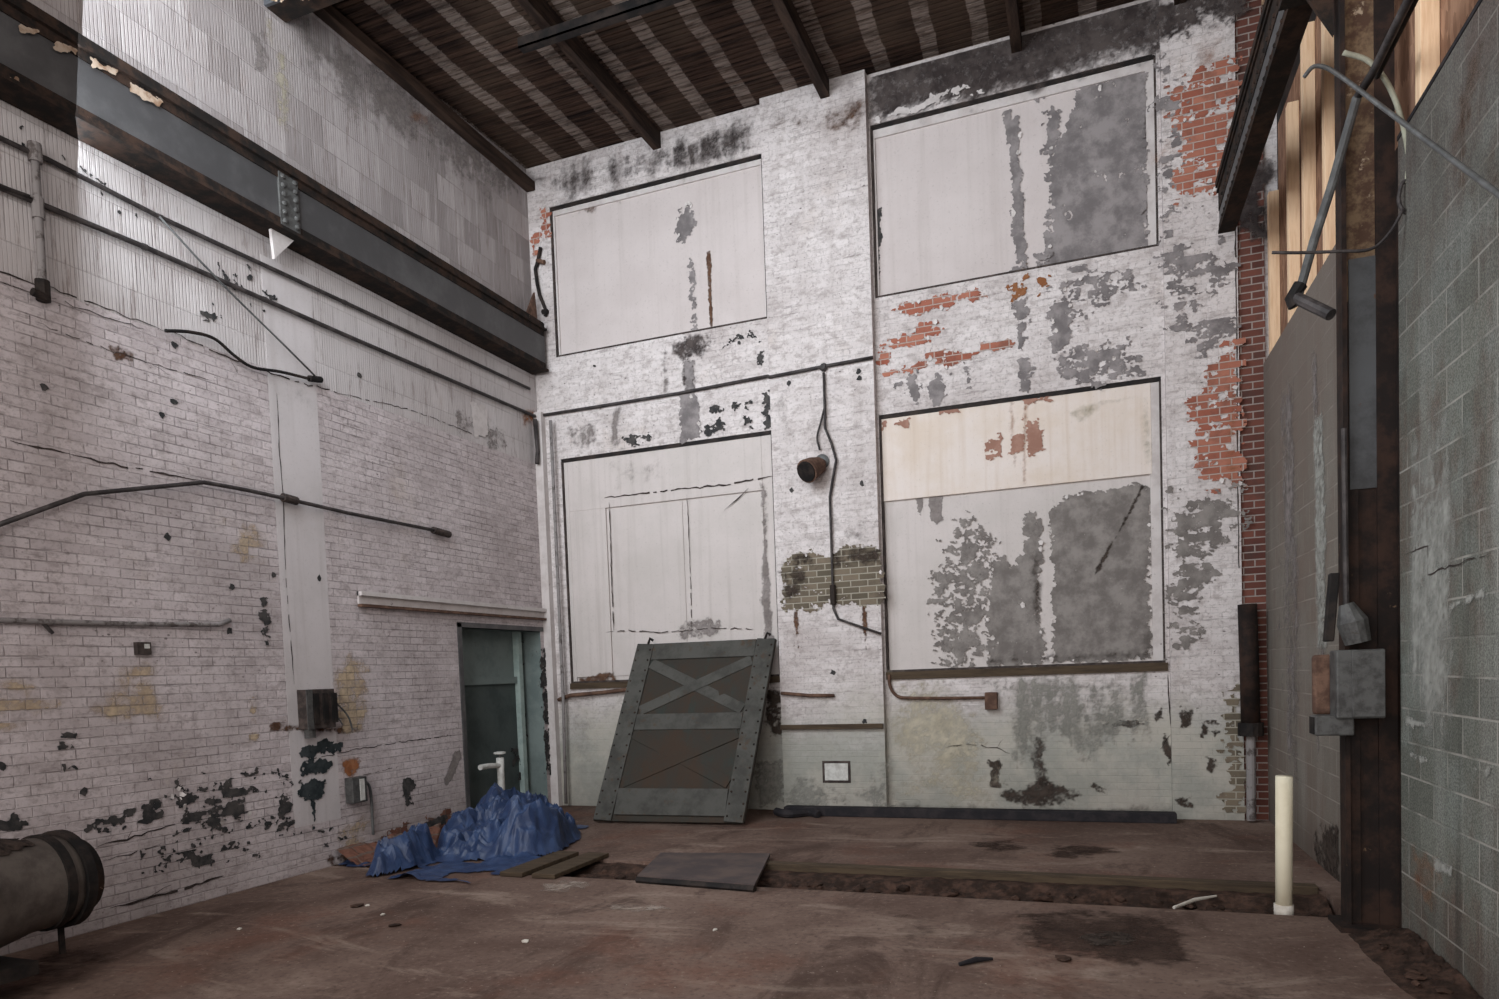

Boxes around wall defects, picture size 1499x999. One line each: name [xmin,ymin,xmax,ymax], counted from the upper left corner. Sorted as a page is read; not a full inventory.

peeling [19,24,39,34]
peeling [53,41,163,106]
peeling [856,43,1253,668]
damp [916,496,943,524]
spalling [779,544,886,613]
damp [1406,449,1487,728]
peeling [57,732,78,772]
damp [897,684,981,796]
damp [1001,673,1148,806]
peeling [0,812,29,831]
peeling [84,767,348,874]
damp [1434,858,1452,875]